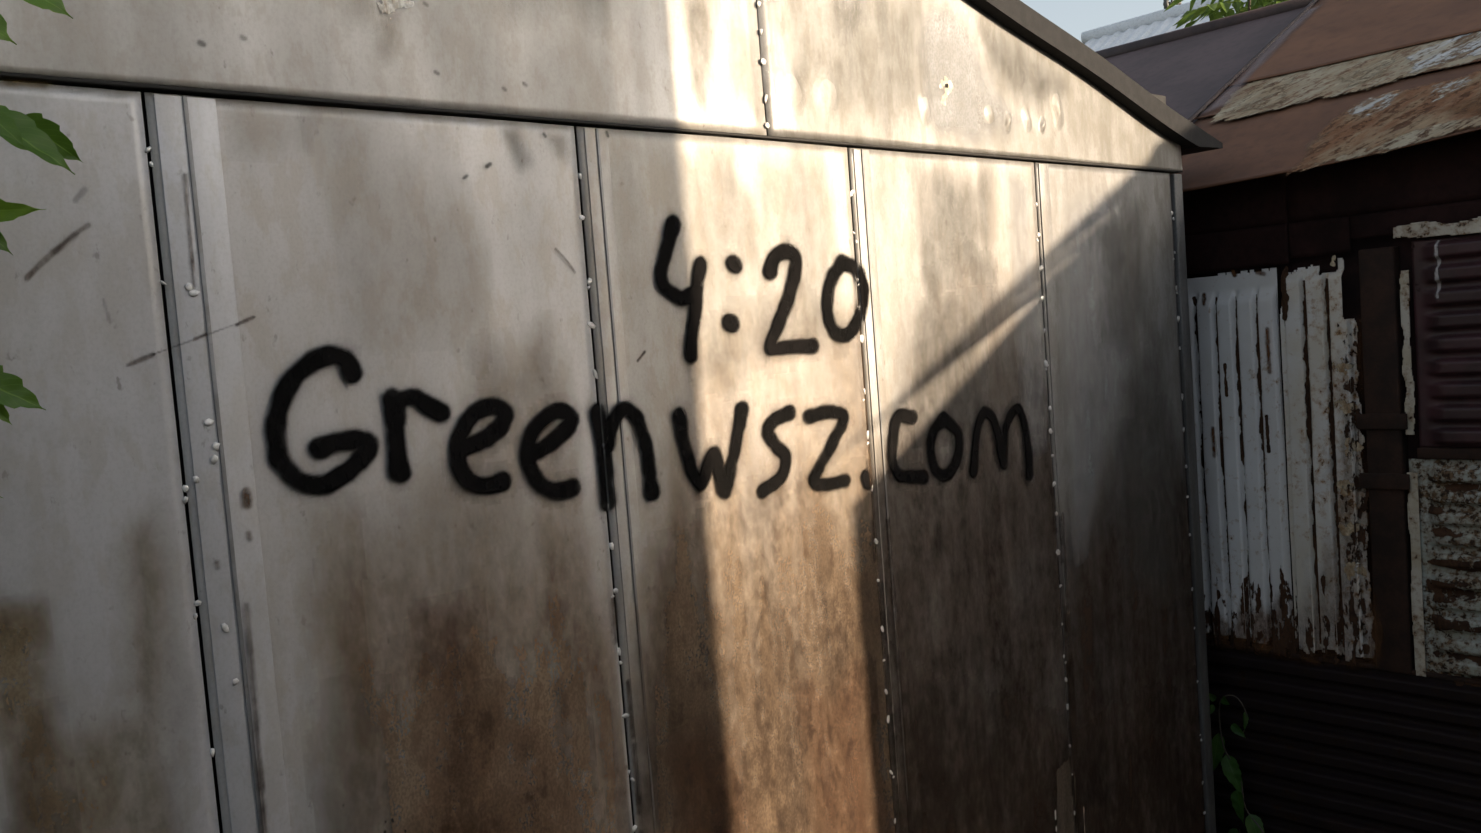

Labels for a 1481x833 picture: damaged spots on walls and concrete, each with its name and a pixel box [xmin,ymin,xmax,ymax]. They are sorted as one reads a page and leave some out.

peeling [1209,31,1481,172]
rust [343,266,1368,833]
peeling [1332,319,1373,655]
peeling [1428,506,1463,538]
peeling [1426,558,1481,633]
peeling [1444,483,1481,492]
rust [0,615,165,833]
peeling [1433,651,1481,687]